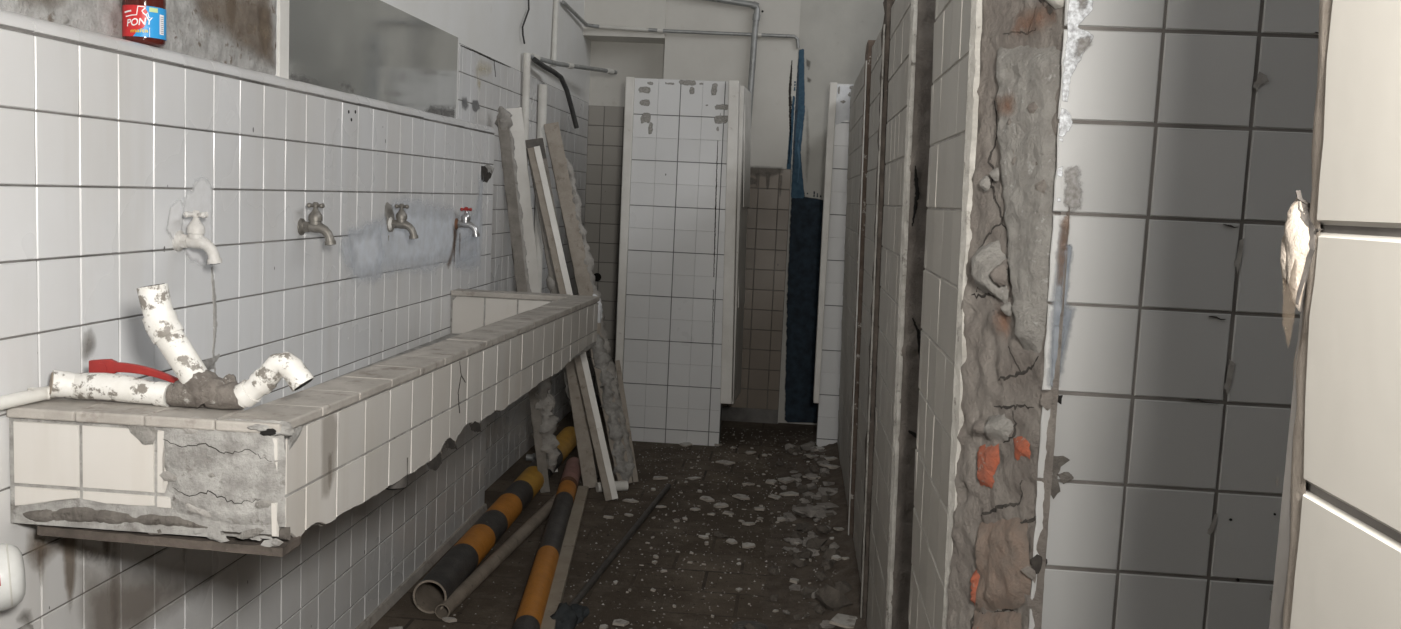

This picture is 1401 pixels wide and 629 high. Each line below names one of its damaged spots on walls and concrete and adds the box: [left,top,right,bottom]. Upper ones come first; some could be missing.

crack [978,101,1008,249]
crack [972,287,996,299]
spalling [942,0,1093,629]
spalling [23,417,304,547]